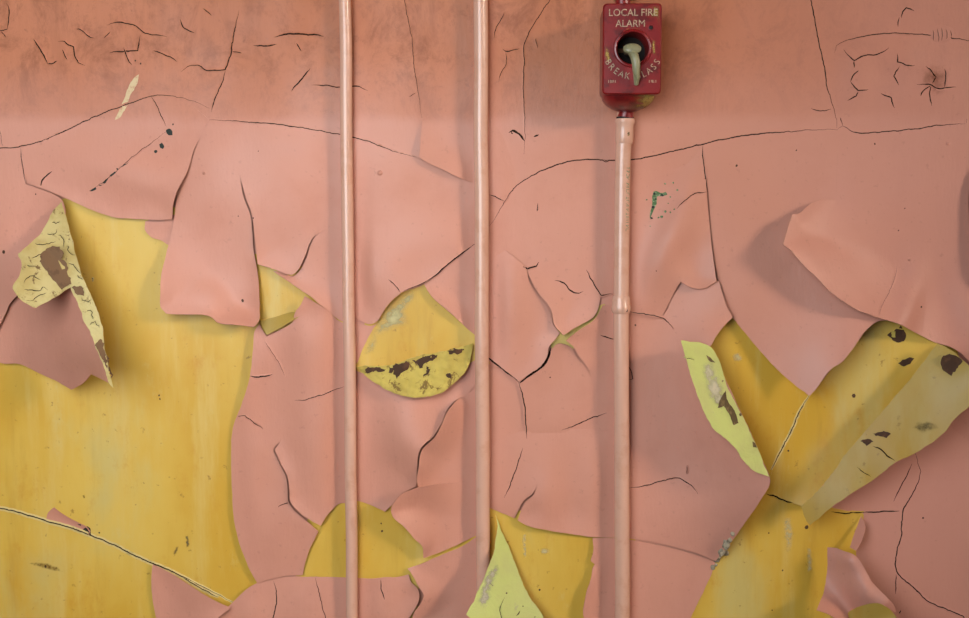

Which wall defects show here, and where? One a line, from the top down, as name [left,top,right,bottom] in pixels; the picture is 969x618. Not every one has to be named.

crack [0,3,416,192]
crack [489,0,969,226]
crack [0,506,233,603]
peeling [0,75,615,618]
crack [388,244,475,293]
crack [489,347,552,498]
crack [523,262,612,297]
crack [627,366,635,381]
crack [629,465,698,494]
crack [770,395,810,470]
peeling [629,123,969,618]
crack [831,453,966,618]